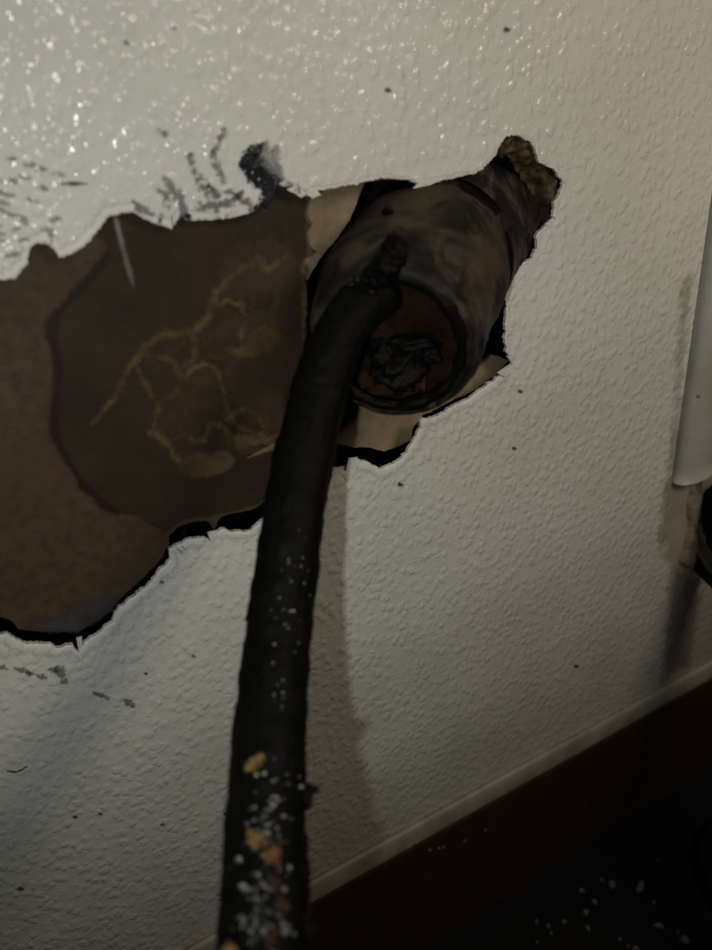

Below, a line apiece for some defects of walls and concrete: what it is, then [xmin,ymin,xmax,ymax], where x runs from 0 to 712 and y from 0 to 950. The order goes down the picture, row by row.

peeling [411,179,438,189]
peeling [287,185,320,199]
peeling [226,203,248,218]
peeling [497,363,516,377]